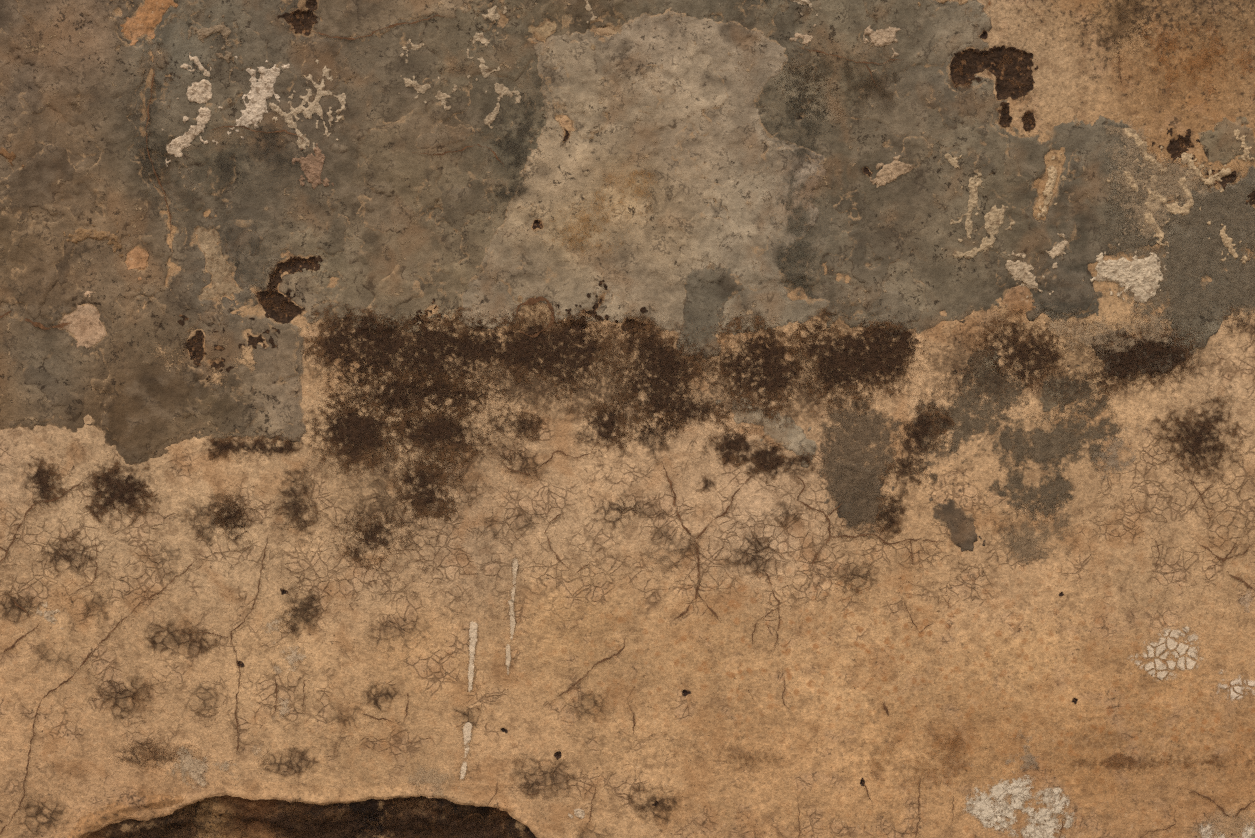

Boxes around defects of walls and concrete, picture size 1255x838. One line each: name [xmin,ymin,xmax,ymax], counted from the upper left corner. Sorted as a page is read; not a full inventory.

peeling [120,0,486,446]
spalling [863,0,1081,325]
peeling [1107,128,1255,264]
crack [0,477,197,835]
crack [175,503,590,761]
water stain [203,304,955,574]
crack [648,463,985,710]
water stain [1129,627,1198,680]
crack [1083,422,1255,633]
water stain [1154,392,1246,481]
flaking render [47,778,563,838]
water stain [965,734,1074,838]